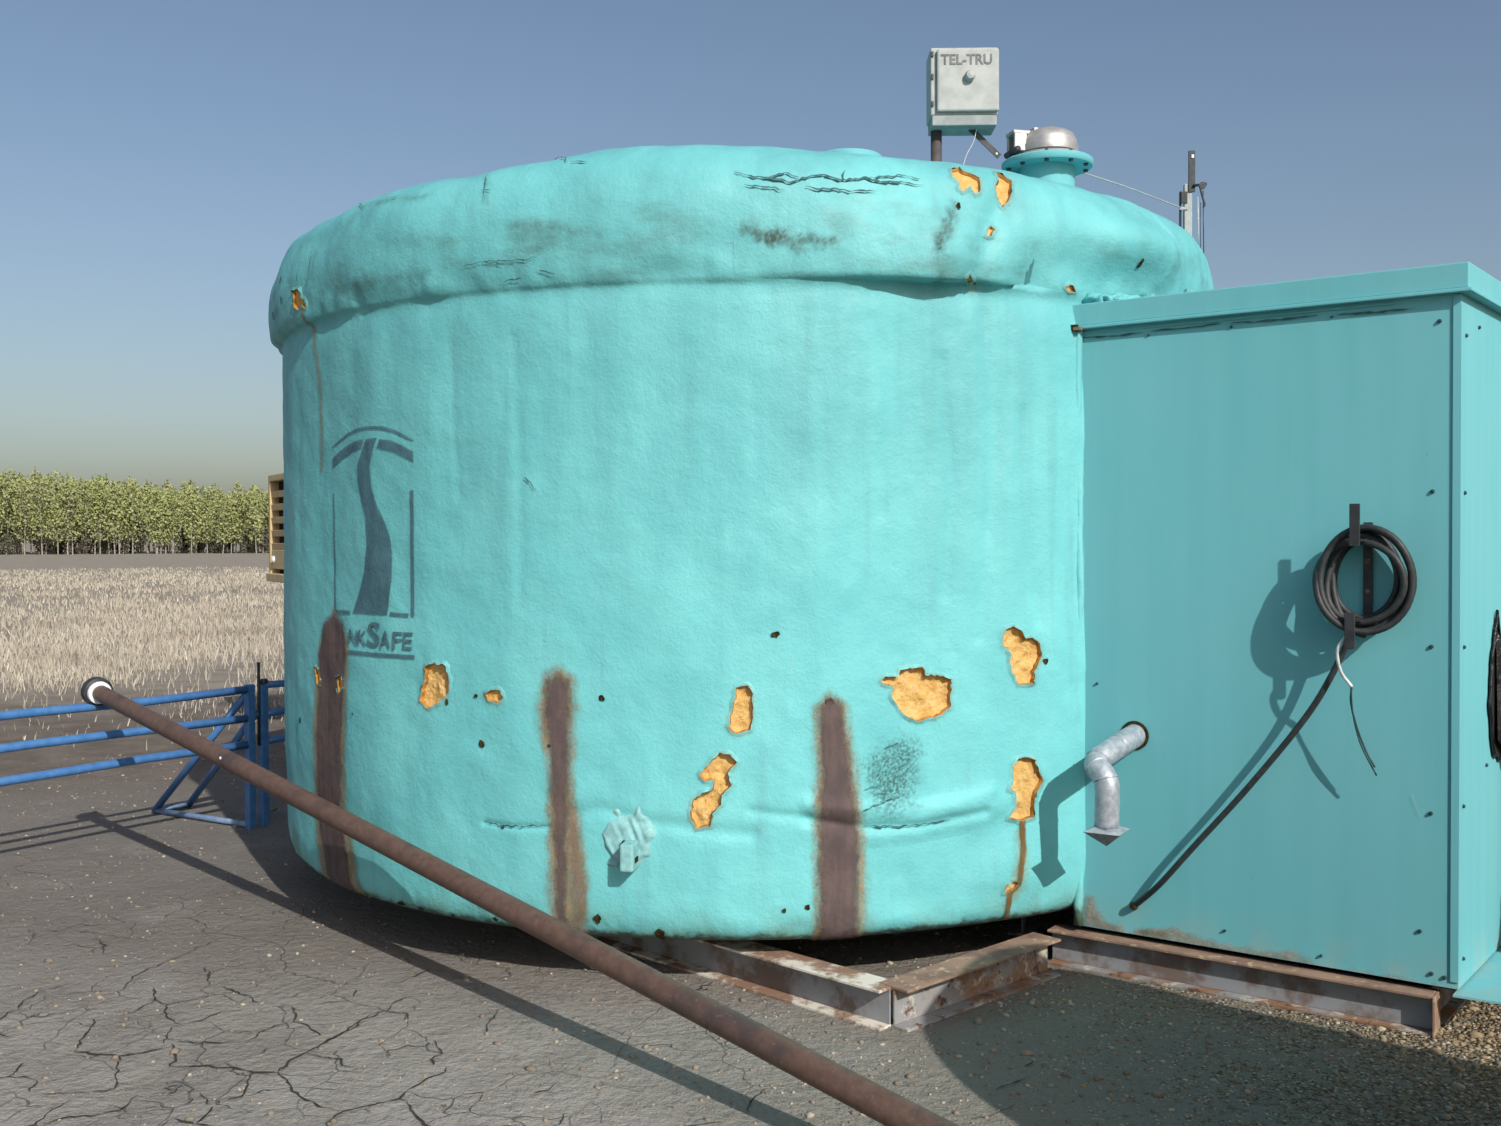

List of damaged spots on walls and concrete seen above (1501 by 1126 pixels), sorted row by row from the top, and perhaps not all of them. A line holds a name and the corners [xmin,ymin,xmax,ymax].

crack [734,171,919,192]
spalling [948,167,1014,240]
corrosion [313,610,347,809]
spalling [418,660,453,712]
spalling [878,664,955,725]
spalling [1000,623,1048,688]
corrosion [539,670,589,935]
spalling [687,682,757,832]
corrosion [813,696,865,940]
spalling [1005,753,1046,825]
corrosion [317,820,365,895]
crack [0,941,447,1126]